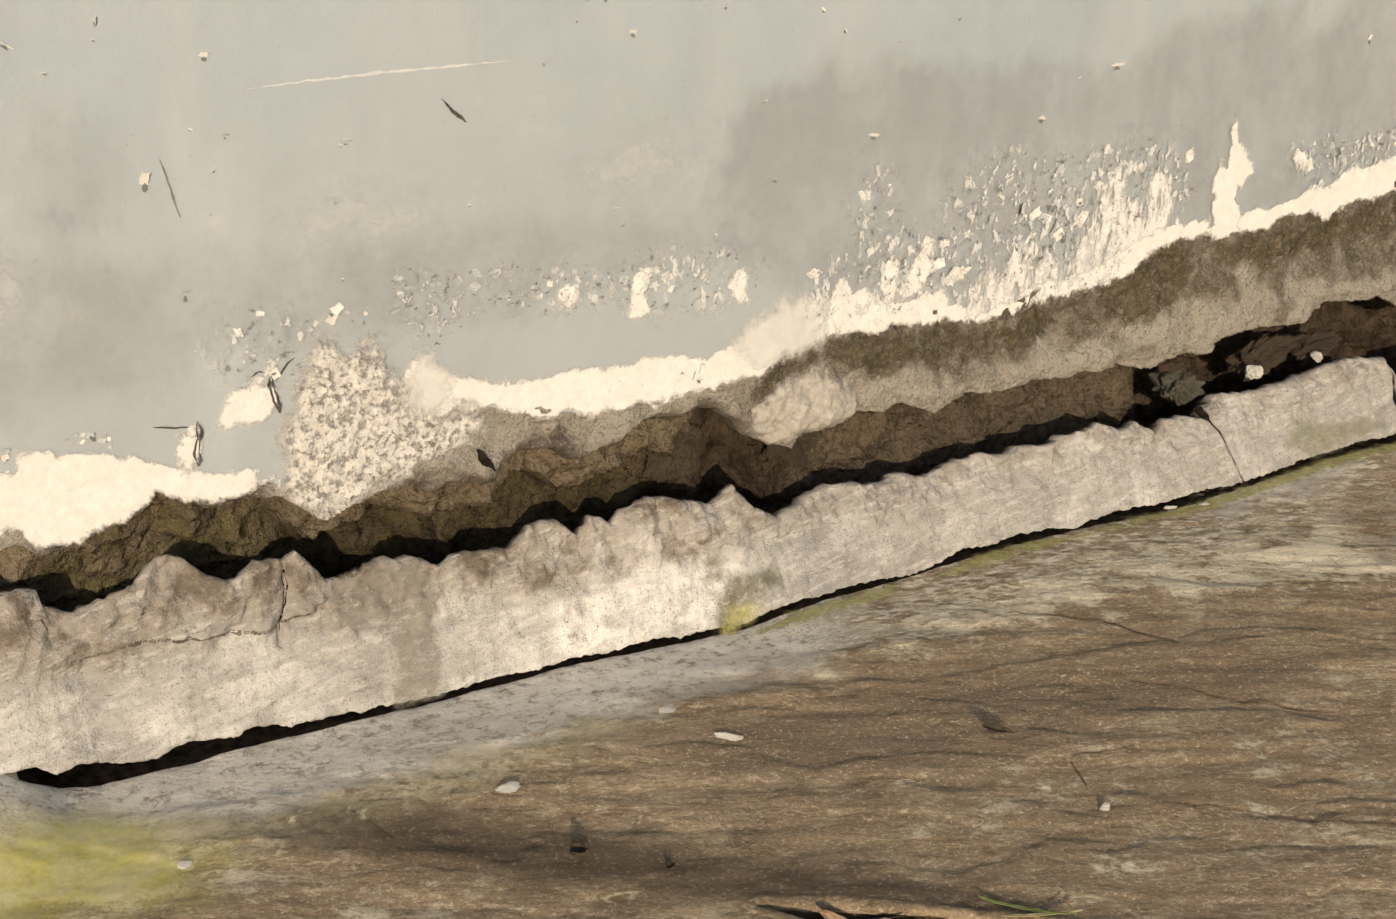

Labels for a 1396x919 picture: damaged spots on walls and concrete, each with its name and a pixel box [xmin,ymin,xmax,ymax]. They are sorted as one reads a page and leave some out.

flaking render [0,122,1396,555]
crack [0,296,1396,788]